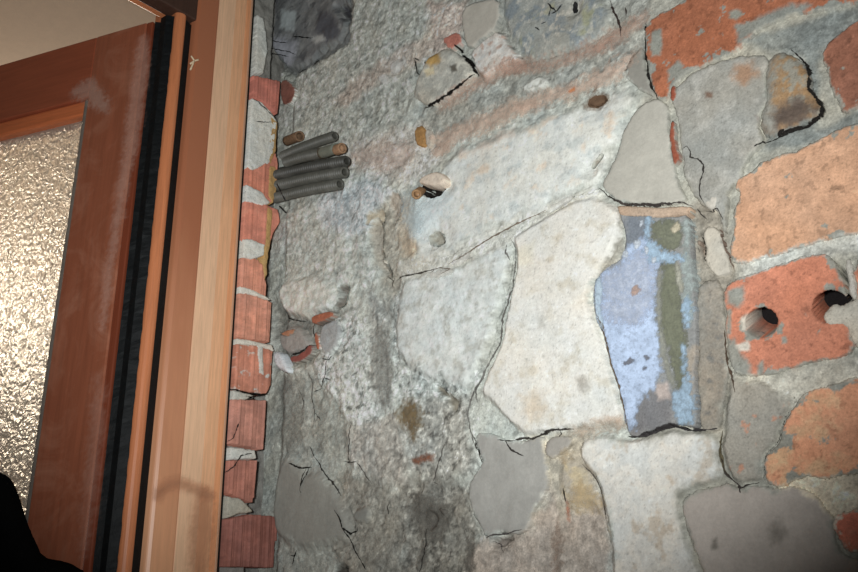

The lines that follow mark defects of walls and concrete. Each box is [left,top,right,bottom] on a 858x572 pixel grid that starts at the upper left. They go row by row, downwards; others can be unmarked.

crack [425,44,479,108]
crack [644,26,658,99]
crack [754,49,825,146]
crack [594,285,759,493]
crack [345,425,372,484]
crack [289,447,365,568]